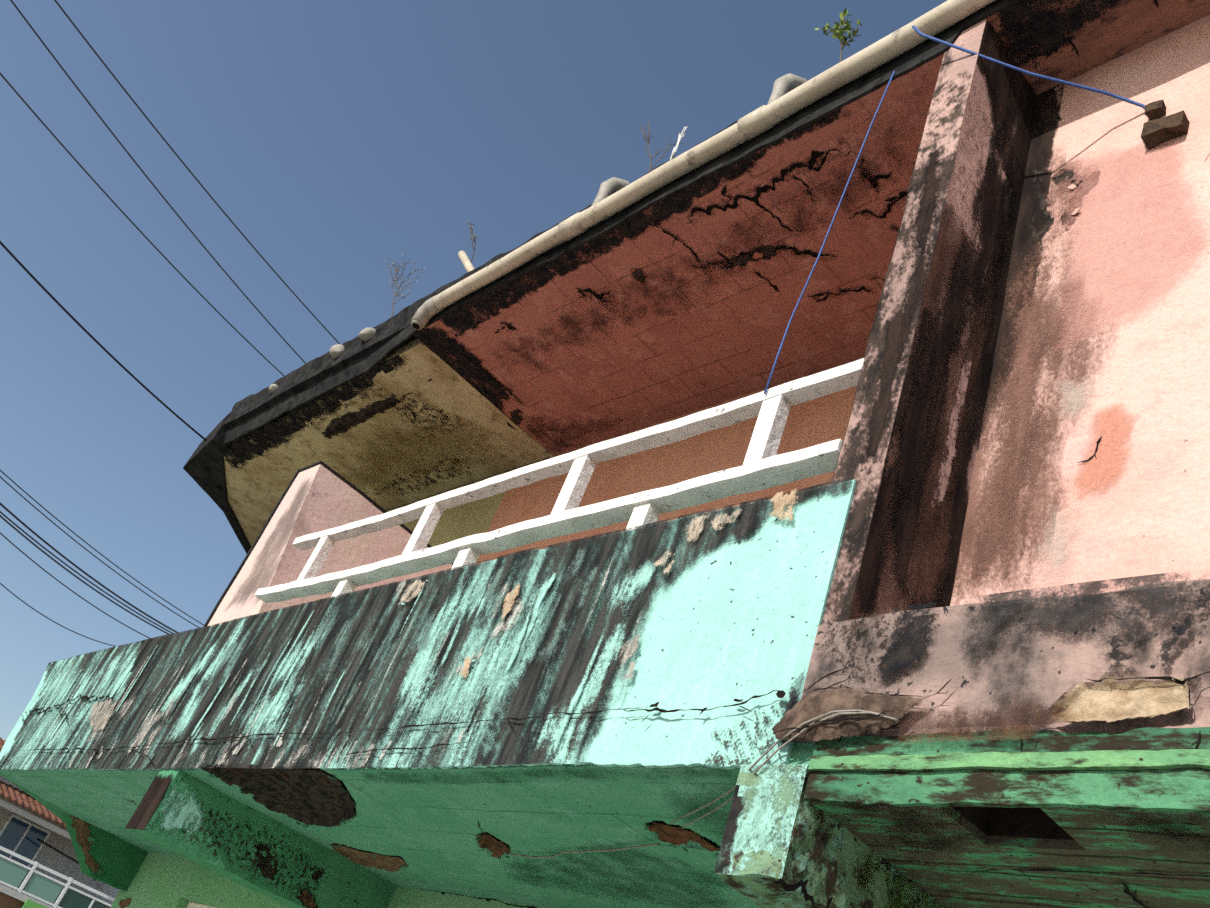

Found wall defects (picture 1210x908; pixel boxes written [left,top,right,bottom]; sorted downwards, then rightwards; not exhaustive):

crack [575,287,616,302]
damp [413,108,899,413]
crack [659,142,916,302]
damp [782,0,1210,678]
damp [225,355,467,469]
damp [0,482,775,830]
crack [20,661,853,805]
damp [703,670,805,766]
damp [866,694,1058,732]
spalling [1046,677,1191,723]
spalling [201,765,357,828]
crack [947,869,1210,908]